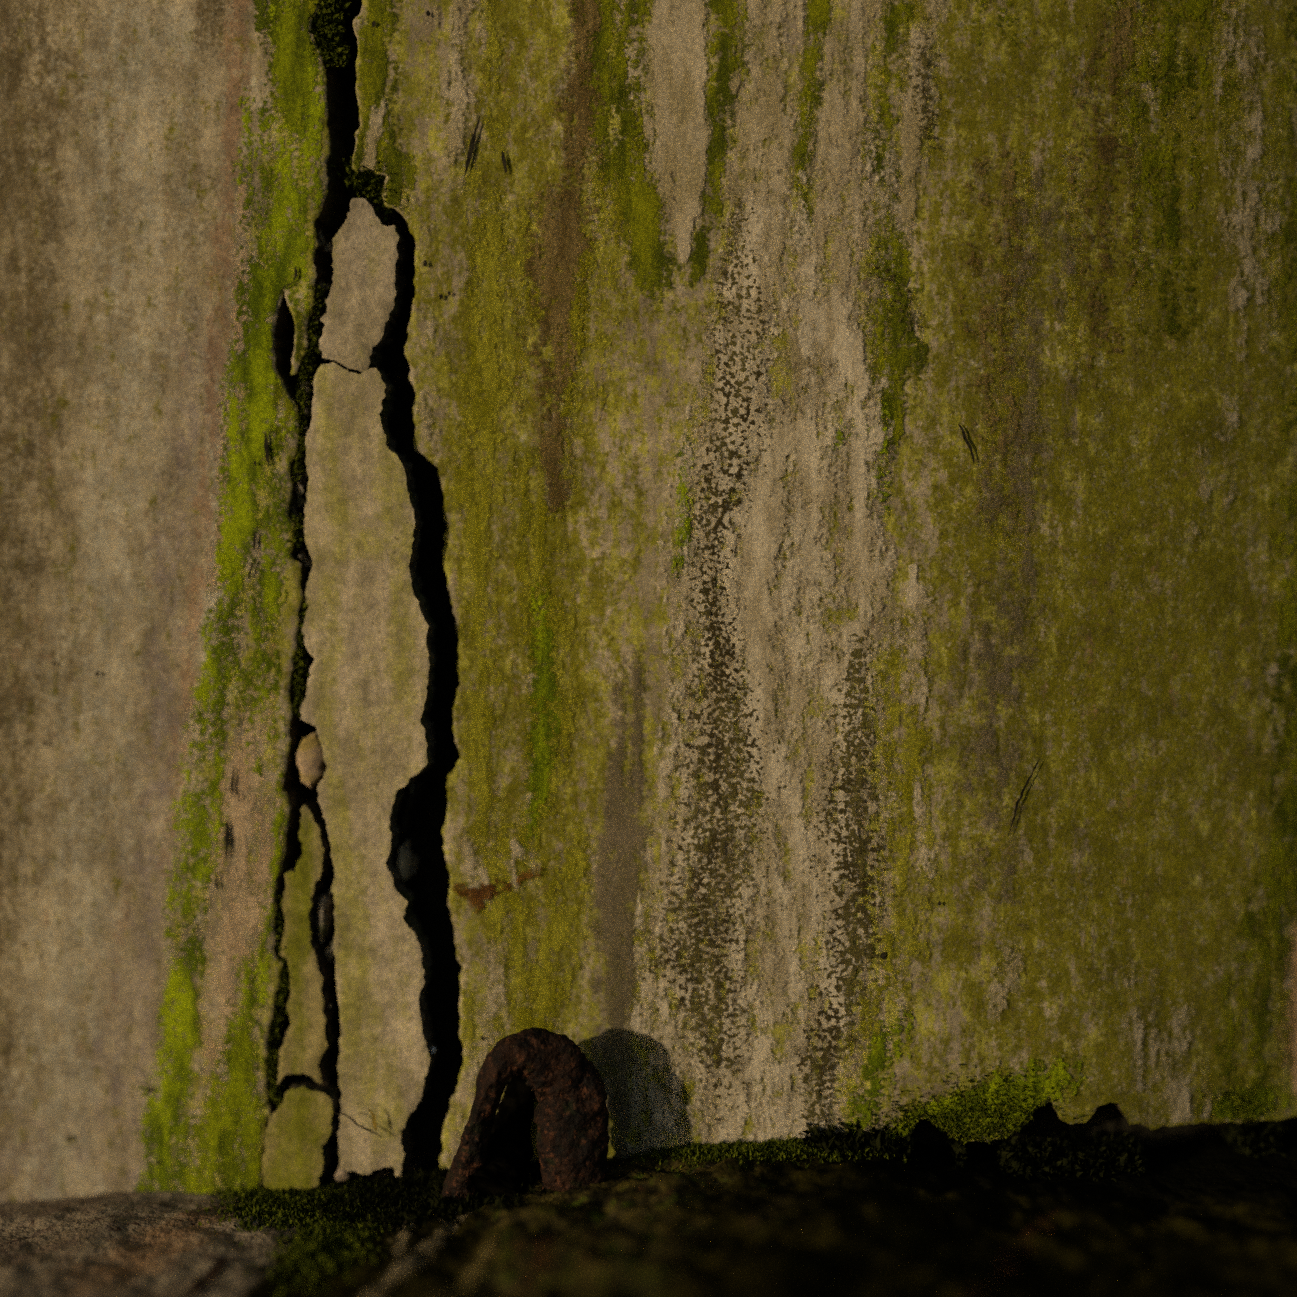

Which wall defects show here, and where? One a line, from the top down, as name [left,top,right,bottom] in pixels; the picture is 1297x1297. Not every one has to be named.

crack [247,531,256,579]
crack [253,431,271,466]
crack [283,0,464,1172]
water stain [414,0,1089,1169]
water stain [948,0,1281,905]
water stain [1123,926,1297,1123]